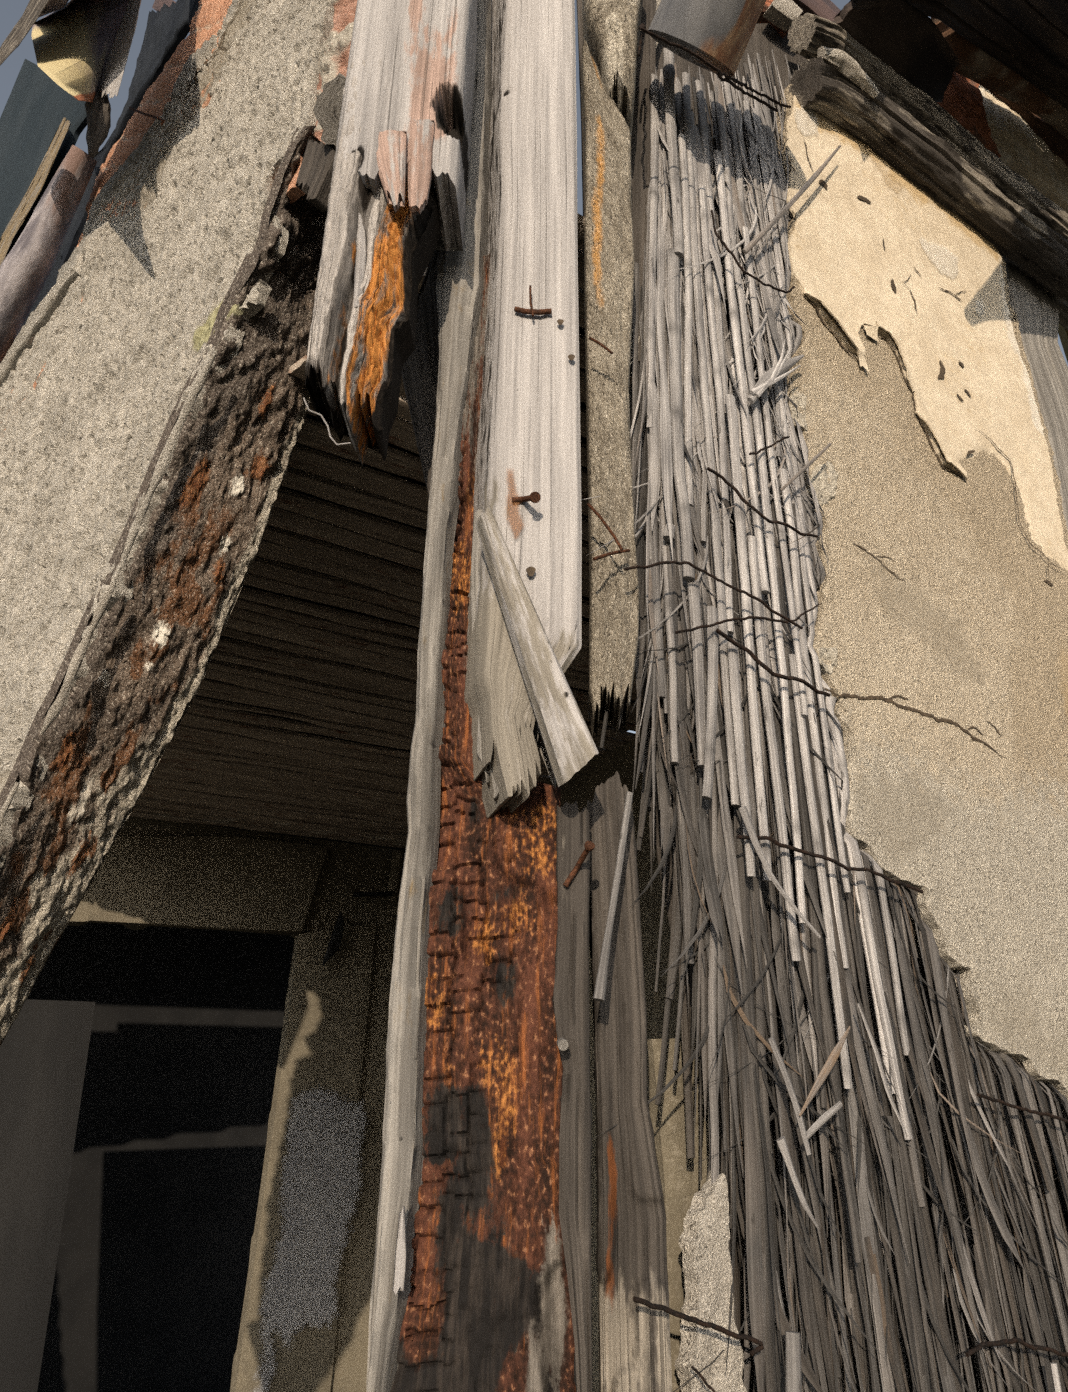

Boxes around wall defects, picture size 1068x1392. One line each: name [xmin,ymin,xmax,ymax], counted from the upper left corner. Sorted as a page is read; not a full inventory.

flaking render [803,282,917,392]
flaking render [789,391,807,431]
corrosion [179,459,208,506]
corrosion [251,454,267,478]
flaking render [807,461,838,505]
flaking render [914,410,975,480]
flaking render [817,647,838,674]
crack [815,686,1008,758]
corrosion [70,831,91,874]